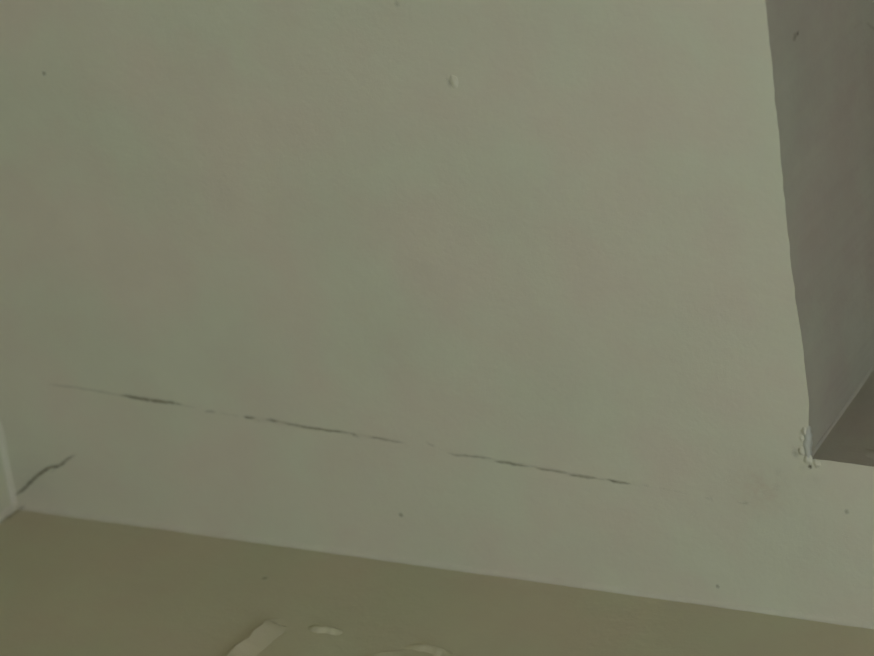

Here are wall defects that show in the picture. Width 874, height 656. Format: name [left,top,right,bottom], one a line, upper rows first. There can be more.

crack [19,462,64,493]